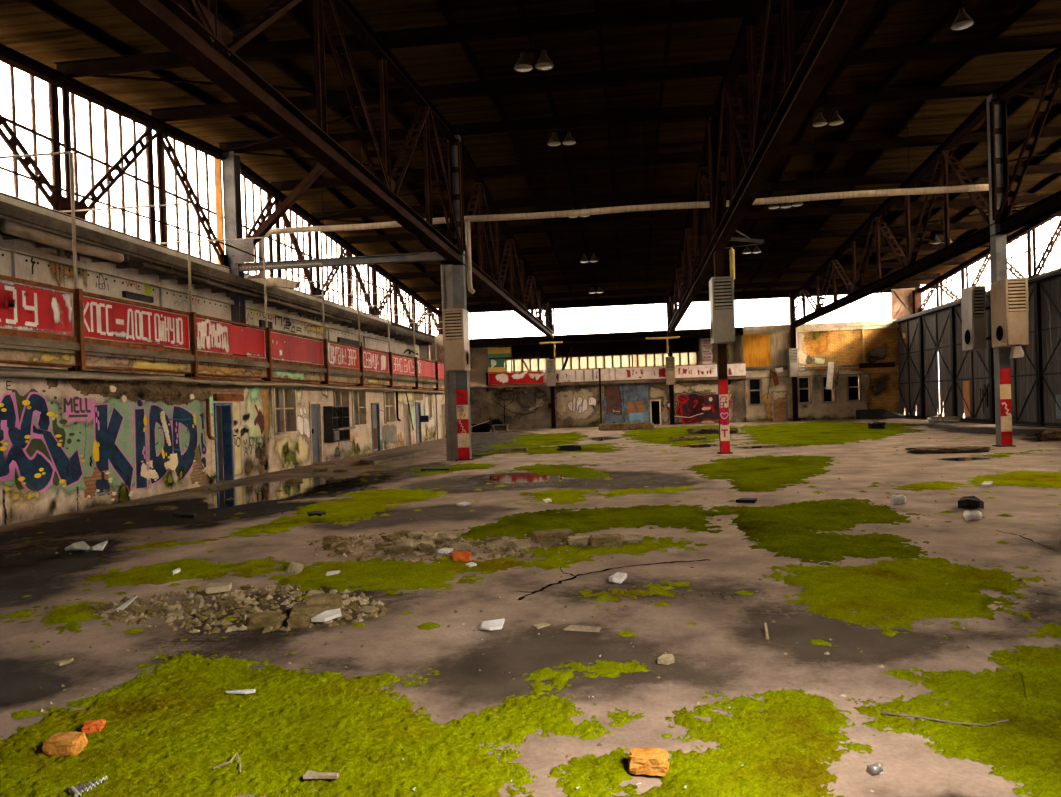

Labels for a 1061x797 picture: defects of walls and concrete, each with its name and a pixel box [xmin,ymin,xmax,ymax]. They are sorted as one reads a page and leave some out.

water stain [0,432,707,608]
spalling [451,550,472,561]
crack [509,559,708,600]
water stain [1030,539,1061,555]
water stain [146,586,420,664]
water stain [0,657,99,708]
water stain [312,658,360,674]
water stain [426,623,733,706]